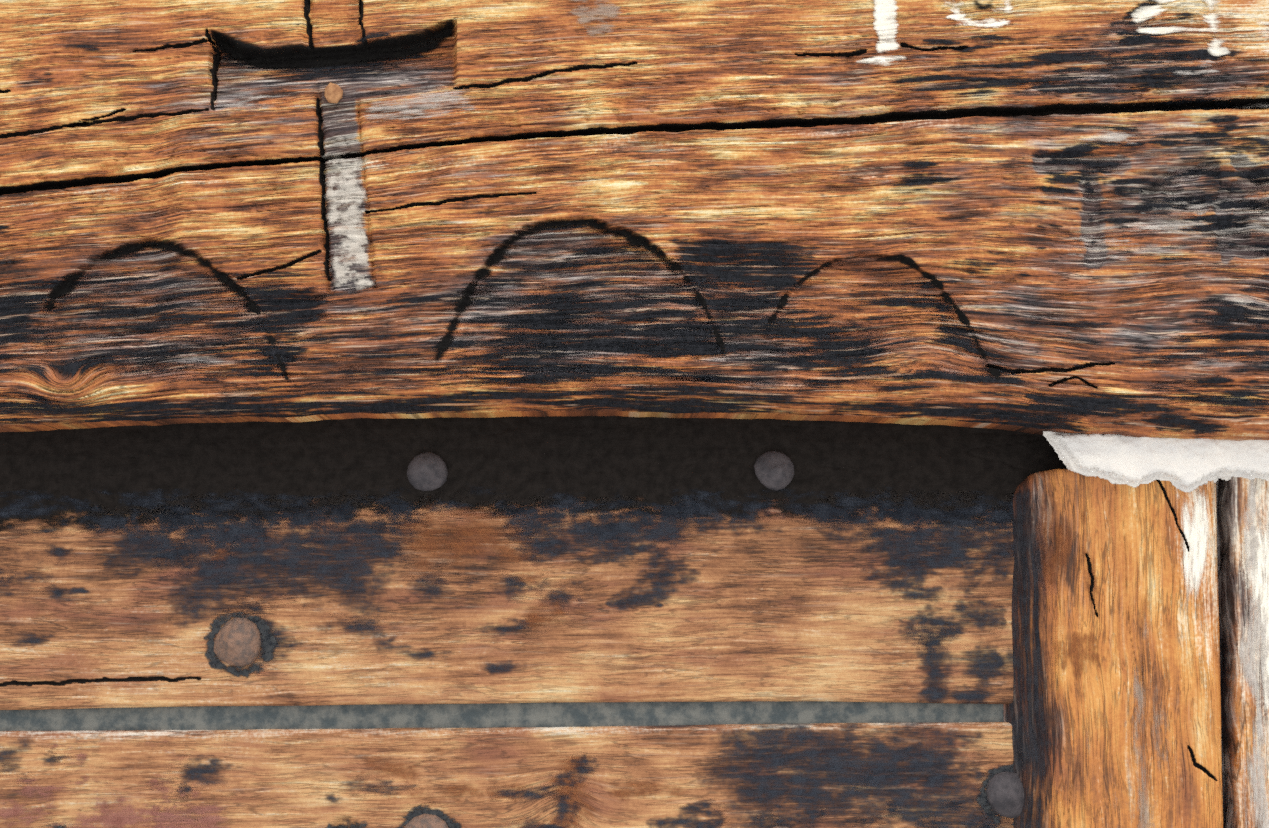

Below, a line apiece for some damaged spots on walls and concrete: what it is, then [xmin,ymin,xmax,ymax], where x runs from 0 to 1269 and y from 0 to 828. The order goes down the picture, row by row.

crack [0,98,1269,281]
crack [1157,480,1189,552]
crack [0,676,201,686]
rust [204,612,277,678]